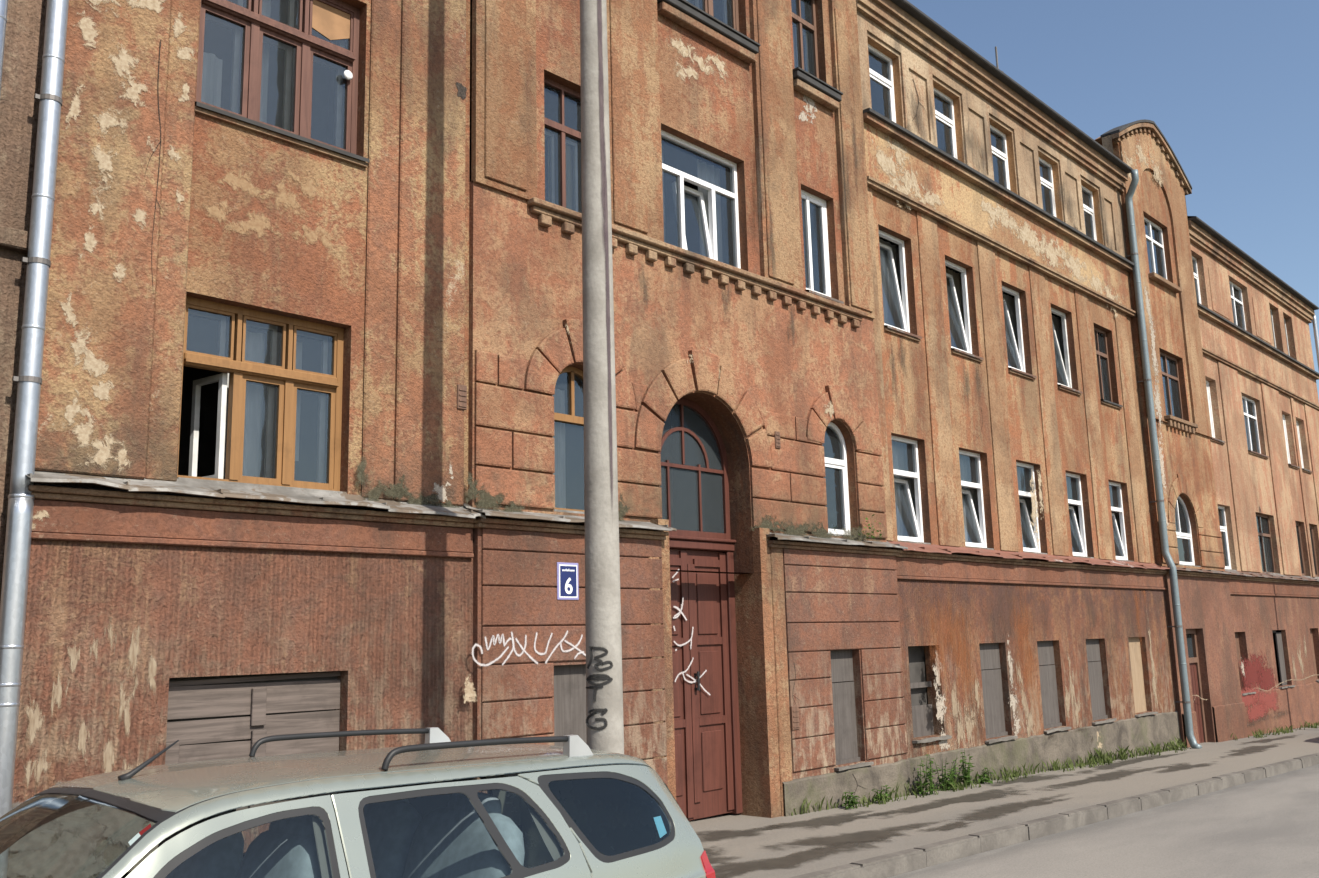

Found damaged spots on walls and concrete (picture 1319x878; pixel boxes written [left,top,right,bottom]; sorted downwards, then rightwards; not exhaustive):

flaking render [66,0,166,257]
flaking render [170,13,194,61]
flaking render [178,83,190,102]
flaking render [668,39,727,82]
flaking render [872,136,944,209]
flaking render [981,194,1124,318]
flaking render [60,294,130,471]
leakage [356,458,524,520]
flaking render [26,620,157,787]
flaking render [932,651,982,751]
flaking render [1007,640,1033,737]
spalling [7,803,148,878]